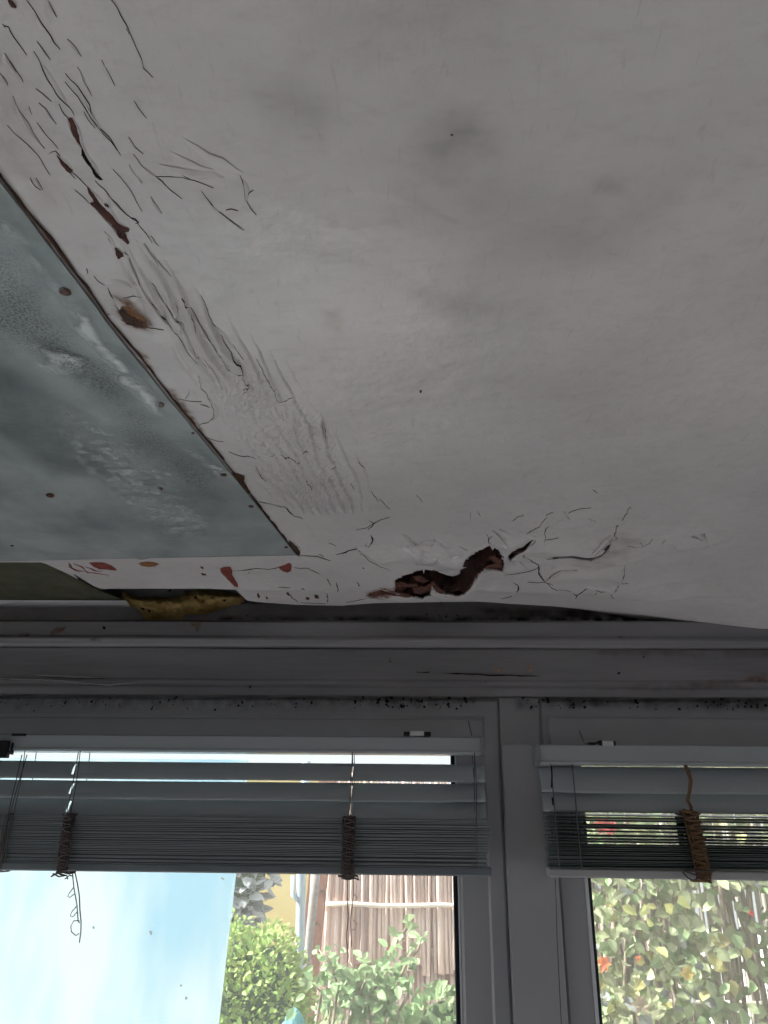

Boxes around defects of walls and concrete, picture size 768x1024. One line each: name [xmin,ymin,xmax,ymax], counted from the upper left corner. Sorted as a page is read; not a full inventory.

crack [0,0,256,276]
crack [86,268,162,330]
corrosion [0,173,298,555]
crack [182,296,293,421]
crack [179,376,326,519]
spalling [369,541,531,604]
crack [459,490,666,599]
mould [354,696,475,710]